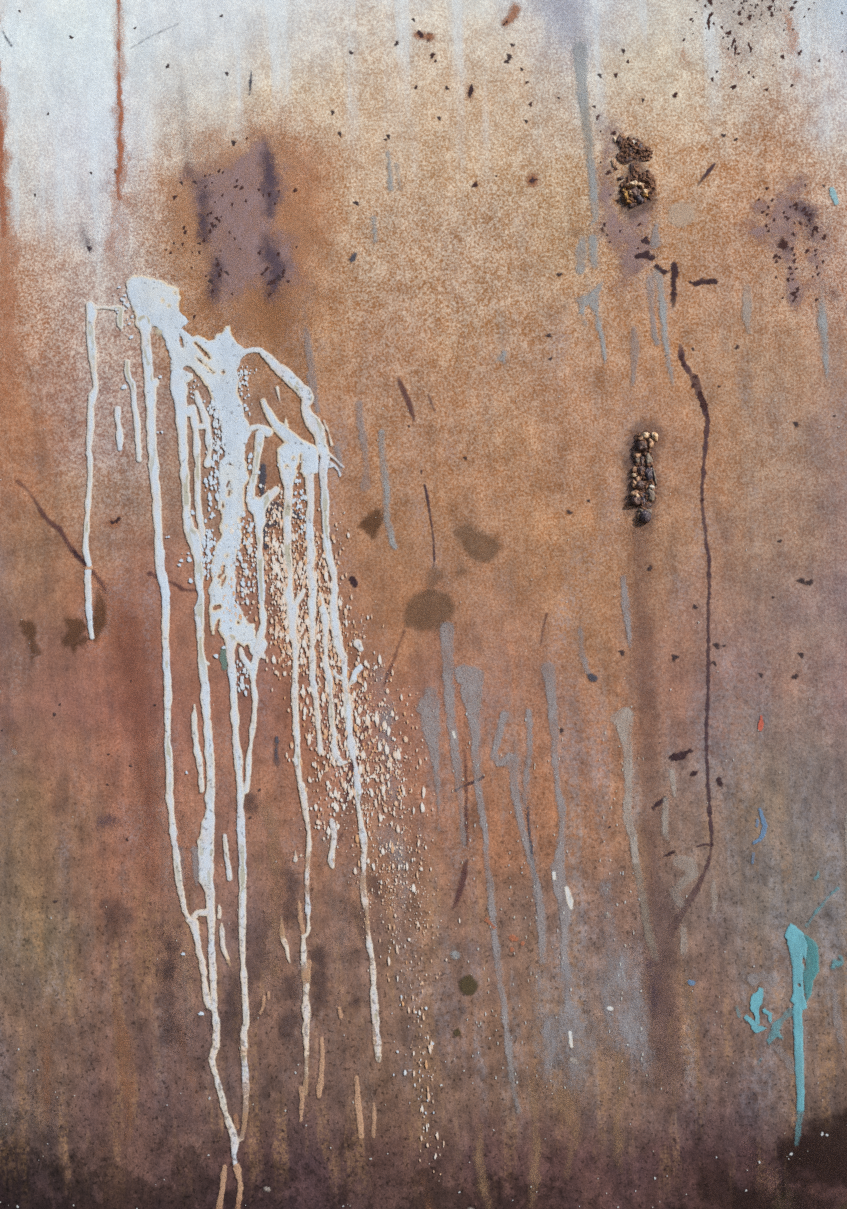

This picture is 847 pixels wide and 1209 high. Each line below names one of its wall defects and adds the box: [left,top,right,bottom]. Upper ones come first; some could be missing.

rust [683,0,815,78]
rust [0,118,18,333]
rust [114,72,124,200]
rust [165,129,312,323]
rust [592,105,655,271]
rust [751,182,826,302]
damp [780,1112,847,1183]